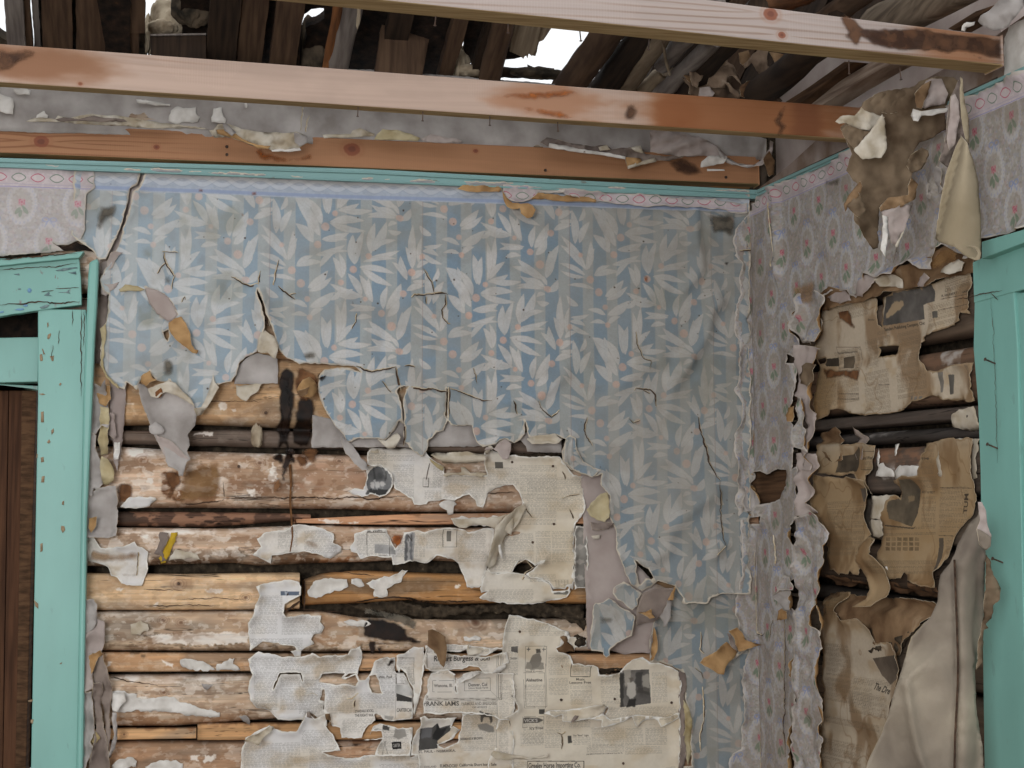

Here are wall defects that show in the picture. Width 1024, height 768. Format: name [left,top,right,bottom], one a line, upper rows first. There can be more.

crack [411,268,450,324]
crack [356,364,560,418]
crack [629,332,657,423]
damp [273,353,325,491]
peeling [586,492,610,522]
peeling [751,469,787,504]
peeling [556,636,574,653]
peeling [678,670,687,768]